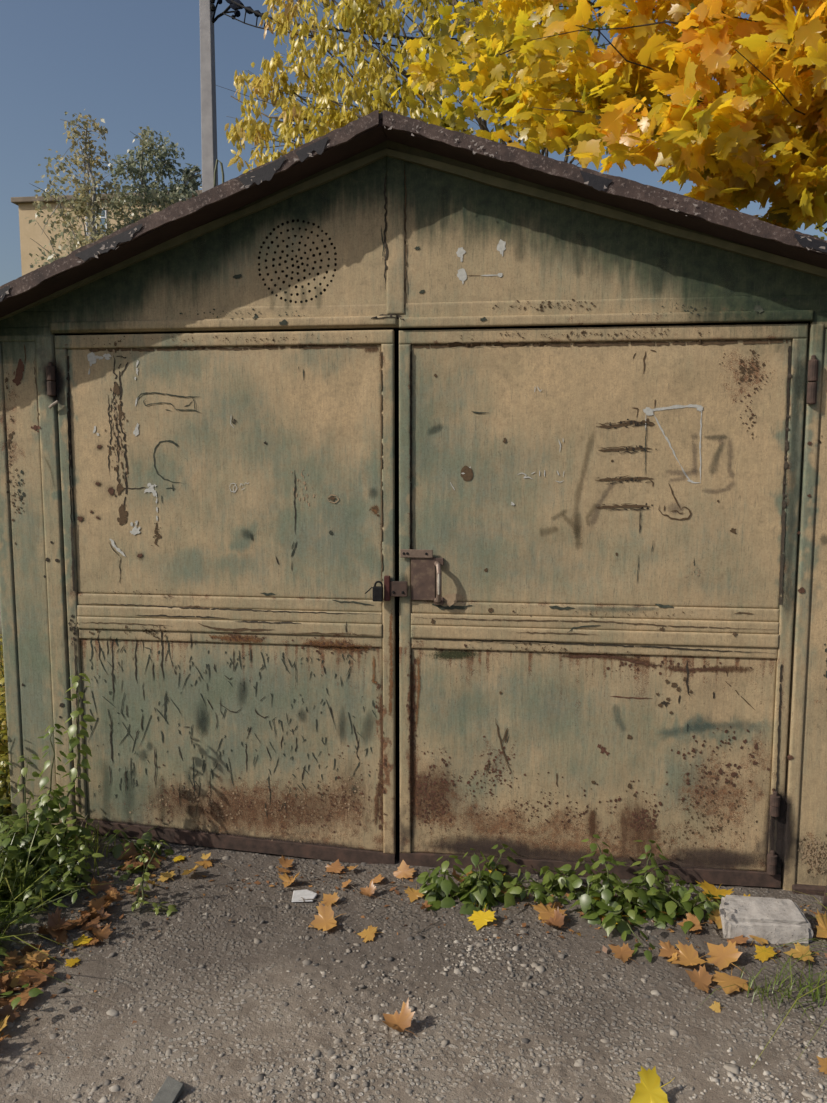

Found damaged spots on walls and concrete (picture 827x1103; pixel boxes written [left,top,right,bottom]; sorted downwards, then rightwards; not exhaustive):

rust [12,359,24,386]
spalling [87,337,119,374]
peeling [135,392,200,413]
peeling [93,382,140,535]
spalling [144,483,158,521]
rust [513,643,752,714]
rust [126,614,394,844]
rust [406,642,470,833]
rust [610,780,662,831]